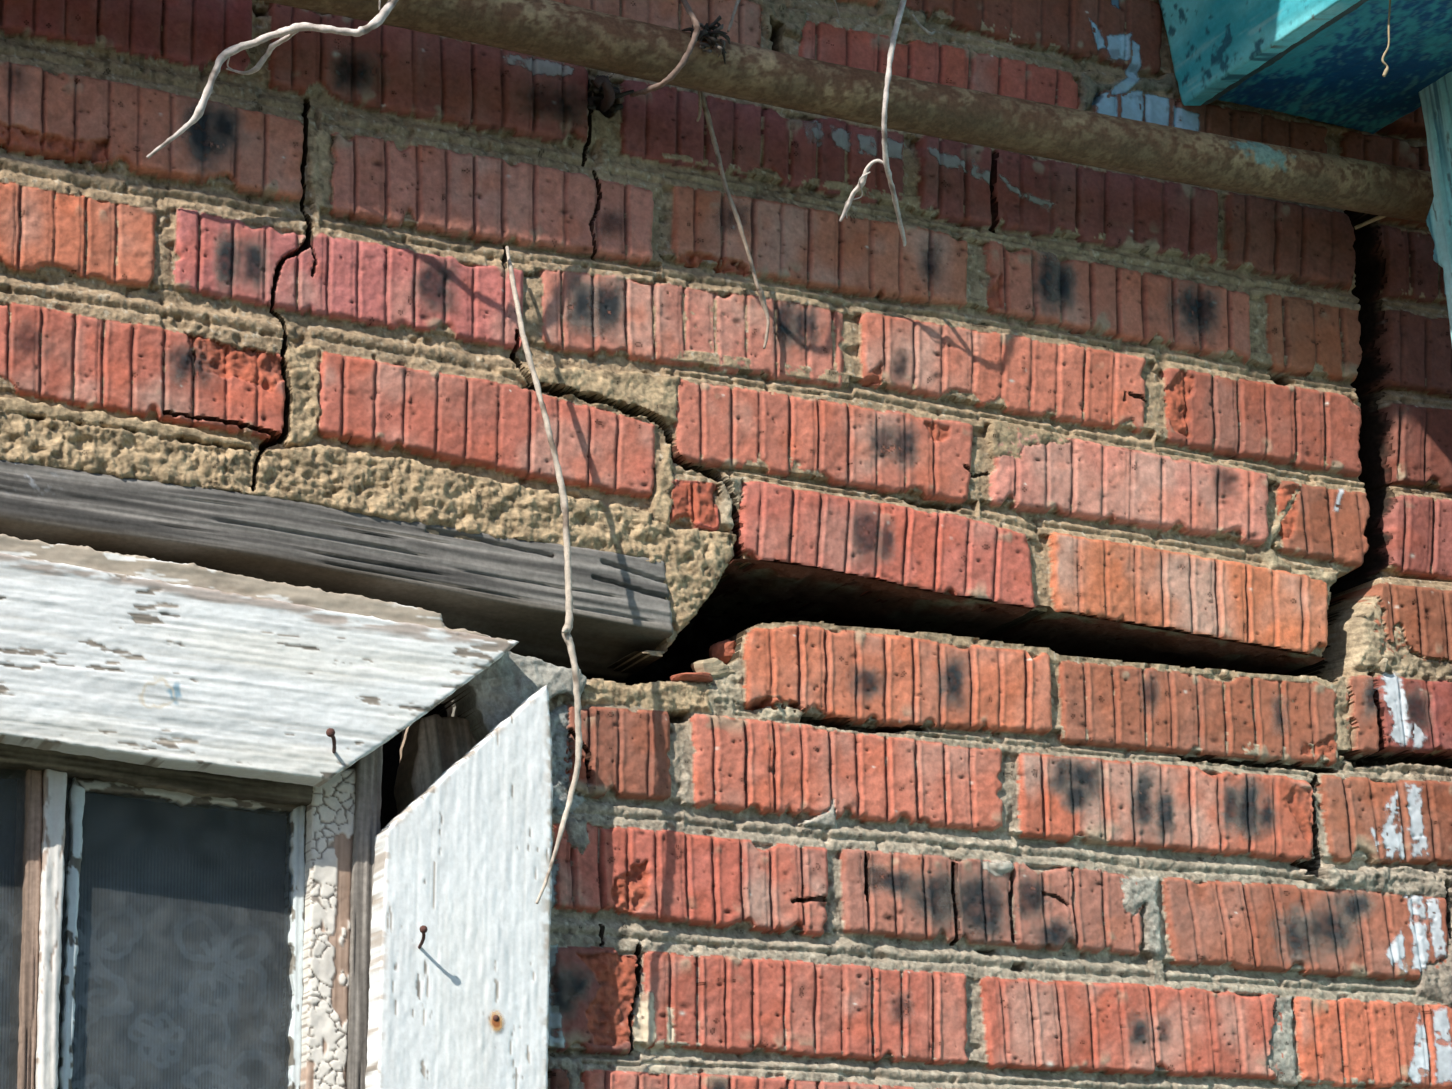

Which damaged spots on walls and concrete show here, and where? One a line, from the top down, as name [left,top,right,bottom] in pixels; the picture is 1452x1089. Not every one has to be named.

crack [538,73,614,260]
crack [988,152,999,234]
crack [163,71,333,494]
crack [497,208,1452,906]
spalling [578,954,637,1046]
crack [579,923,644,1054]
crack [690,978,754,1063]
crack [791,830,909,1015]
crack [944,862,1018,1008]
crack [1000,877,1067,943]
crack [1256,986,1412,1089]
crack [1423,862,1452,946]